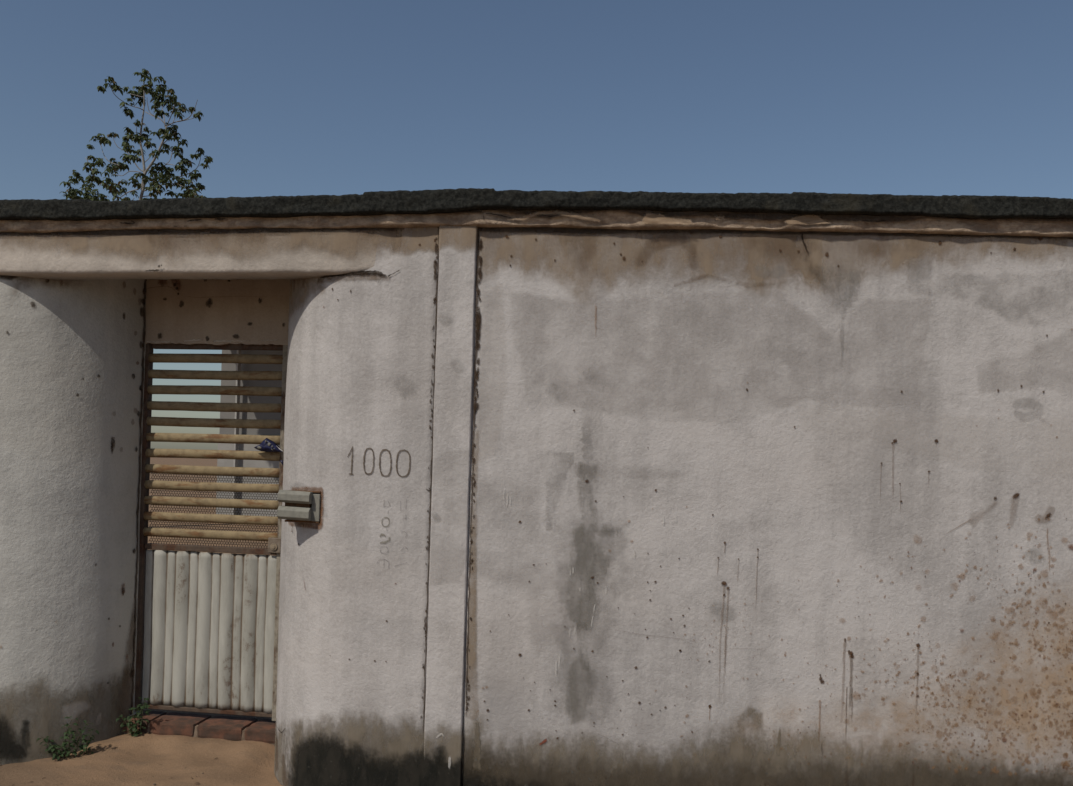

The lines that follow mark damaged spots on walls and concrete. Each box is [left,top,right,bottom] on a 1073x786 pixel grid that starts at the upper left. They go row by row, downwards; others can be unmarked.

crack [321,270,399,279]
leakage [0,225,1073,786]